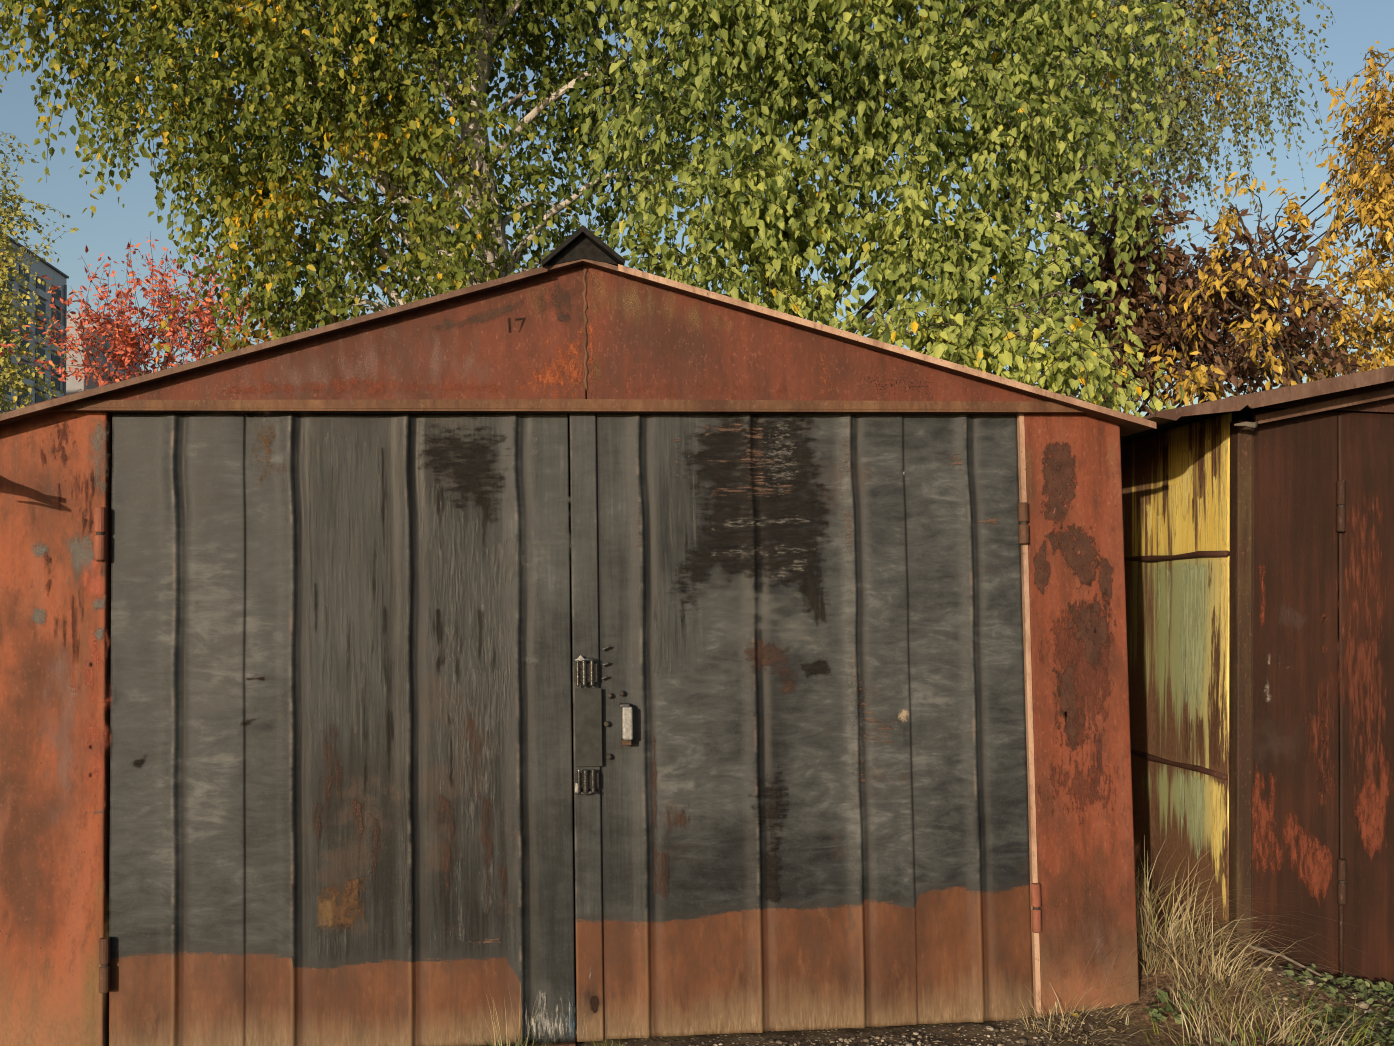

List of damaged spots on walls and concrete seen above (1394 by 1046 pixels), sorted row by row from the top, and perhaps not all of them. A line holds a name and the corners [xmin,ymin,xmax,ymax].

rust [530,324,593,397]
rust [40,421,75,471]
peeling [677,416,829,612]
rust [55,596,83,661]
peeling [1323,498,1393,858]
peeling [1252,765,1332,900]
rust [318,879,365,929]